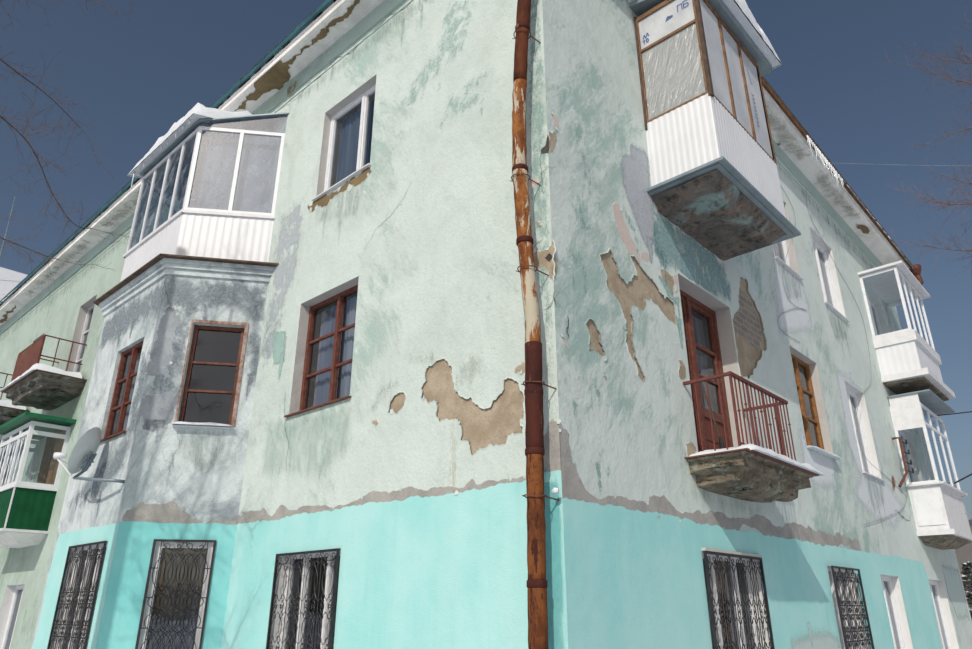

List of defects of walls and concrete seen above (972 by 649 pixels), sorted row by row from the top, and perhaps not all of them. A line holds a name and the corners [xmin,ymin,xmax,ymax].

peeling [234,0,360,111]
spalling [307,167,372,213]
spalling [533,239,558,280]
peeling [599,145,683,383]
peeling [584,318,607,361]
spalling [732,276,767,380]
peeling [388,391,407,415]
peeling [420,358,526,457]
peeling [121,474,526,530]
peeling [544,419,862,553]